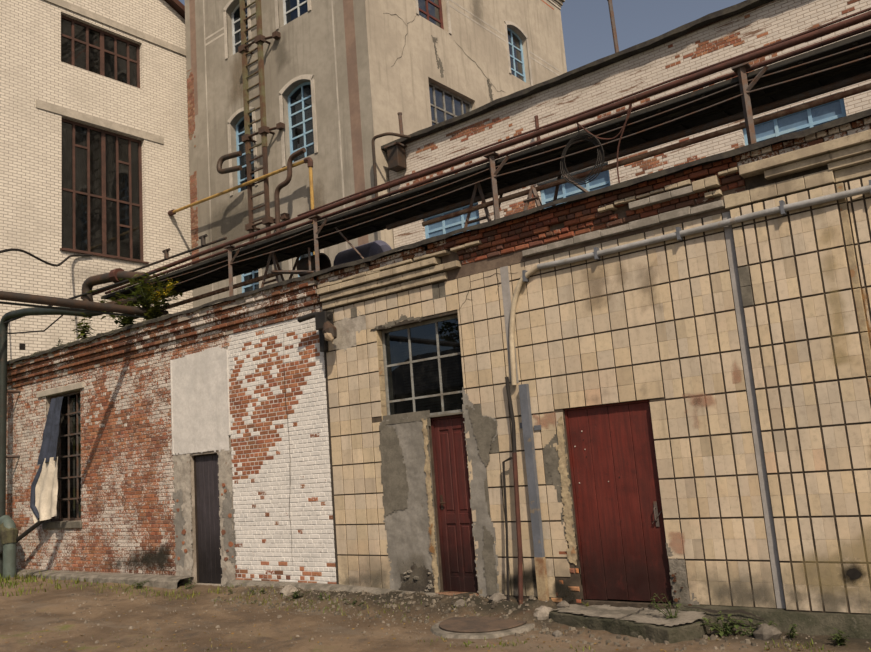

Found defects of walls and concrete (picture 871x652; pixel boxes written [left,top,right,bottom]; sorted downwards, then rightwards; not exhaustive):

crack [456,43,504,101]
peeling [80,349,173,438]
peeling [6,381,68,570]
flaking render [156,453,194,582]
peeling [217,331,336,597]
spalling [399,562,435,593]